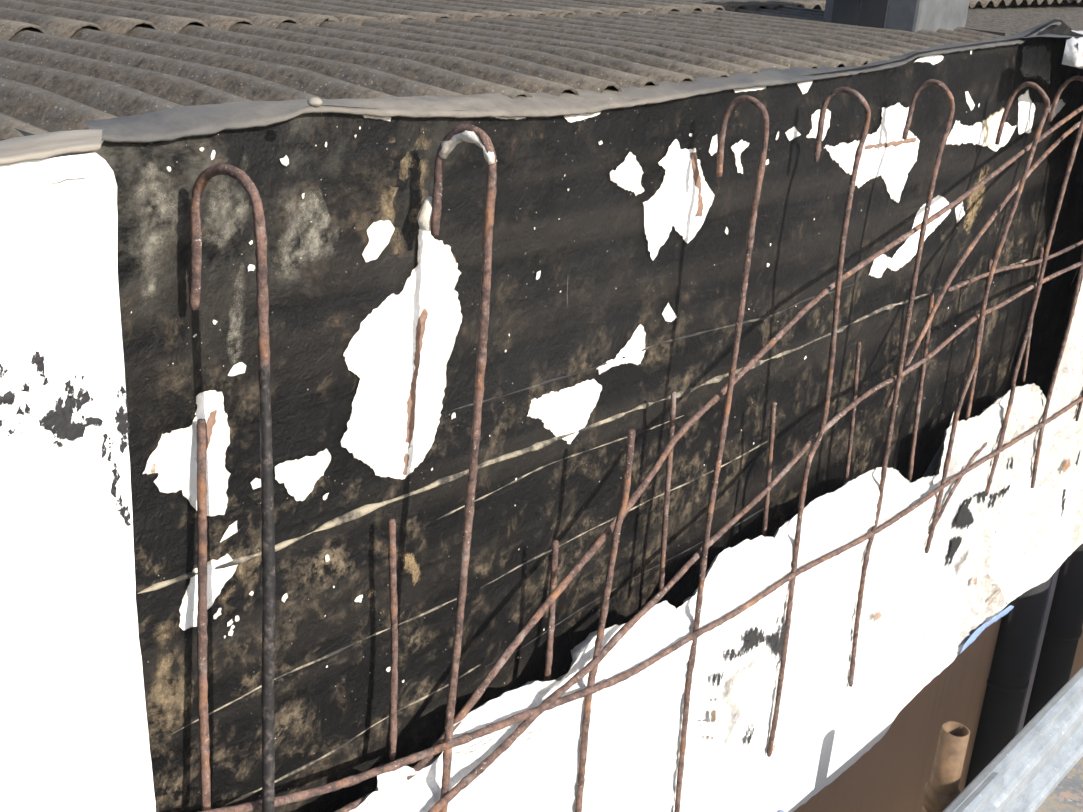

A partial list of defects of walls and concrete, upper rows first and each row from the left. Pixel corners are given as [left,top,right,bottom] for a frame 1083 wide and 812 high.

leakage [135,163,181,296]
leakage [282,192,338,277]
leakage [381,142,427,253]
spalling [610,134,718,260]
spalling [785,103,920,203]
spalling [946,90,1035,151]
spalling [341,229,462,479]
spalling [143,390,238,542]
corrosion [189,75,1083,812]
leakage [403,554,420,582]
spalling [349,267,1083,812]
leakage [152,654,192,726]